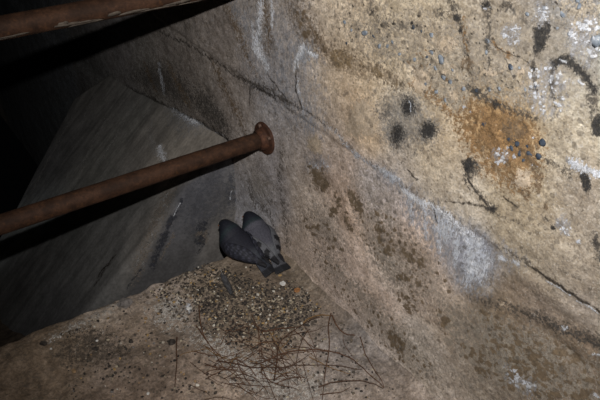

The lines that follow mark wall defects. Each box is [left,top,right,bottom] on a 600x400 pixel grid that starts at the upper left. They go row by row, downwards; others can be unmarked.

crack [160,31,322,123]
rust [407,82,549,203]
damp [320,121,520,292]
crack [434,174,519,224]
crack [525,263,600,314]